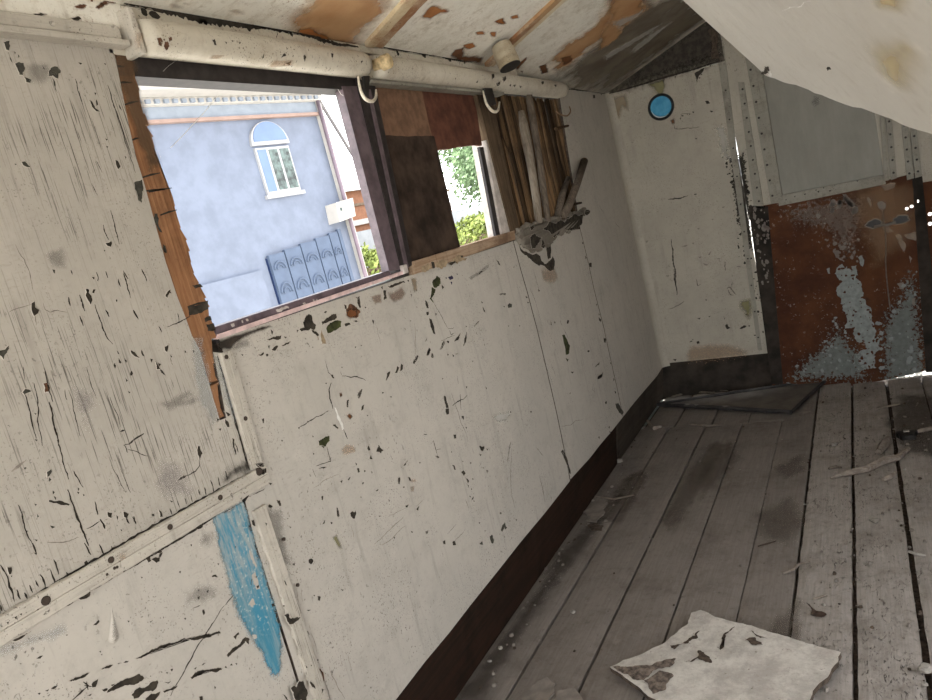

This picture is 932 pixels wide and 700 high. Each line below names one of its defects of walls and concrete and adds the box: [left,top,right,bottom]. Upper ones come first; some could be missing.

peeling [3,40,32,84]
peeling [134,180,143,203]
peeling [519,209,590,272]
peeling [779,183,928,384]
peeling [297,296,366,344]
peeling [385,254,479,381]
peeling [114,344,173,393]
peeling [313,389,368,455]
peeling [272,604,310,625]
peeling [68,630,221,700]
peeling [190,632,257,680]
peeling [283,659,324,700]